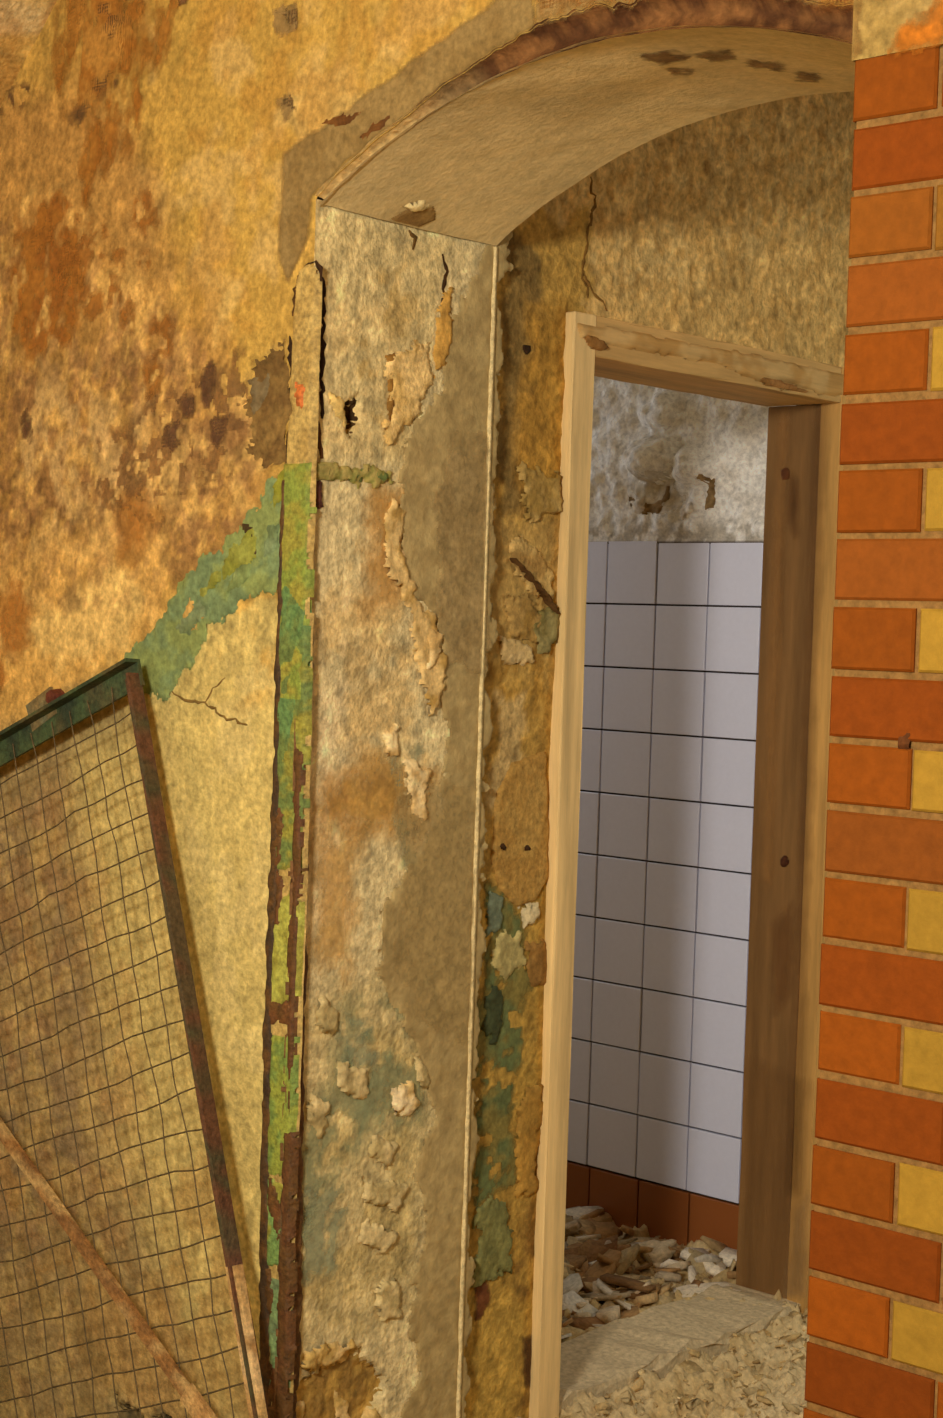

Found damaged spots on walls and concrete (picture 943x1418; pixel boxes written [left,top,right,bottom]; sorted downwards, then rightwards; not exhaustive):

crack [581,177,608,311]
damp [21,409,33,438]
damp [95,354,248,512]
peeling [124,339,292,702]
corrosion [316,480,324,509]
peeling [497,461,564,666]
crack [171,678,248,726]
peeling [382,724,432,824]
corrosion [258,480,310,1418]
peeling [389,1056,430,1118]
peeling [471,881,547,1288]
spalling [295,1339,383,1418]